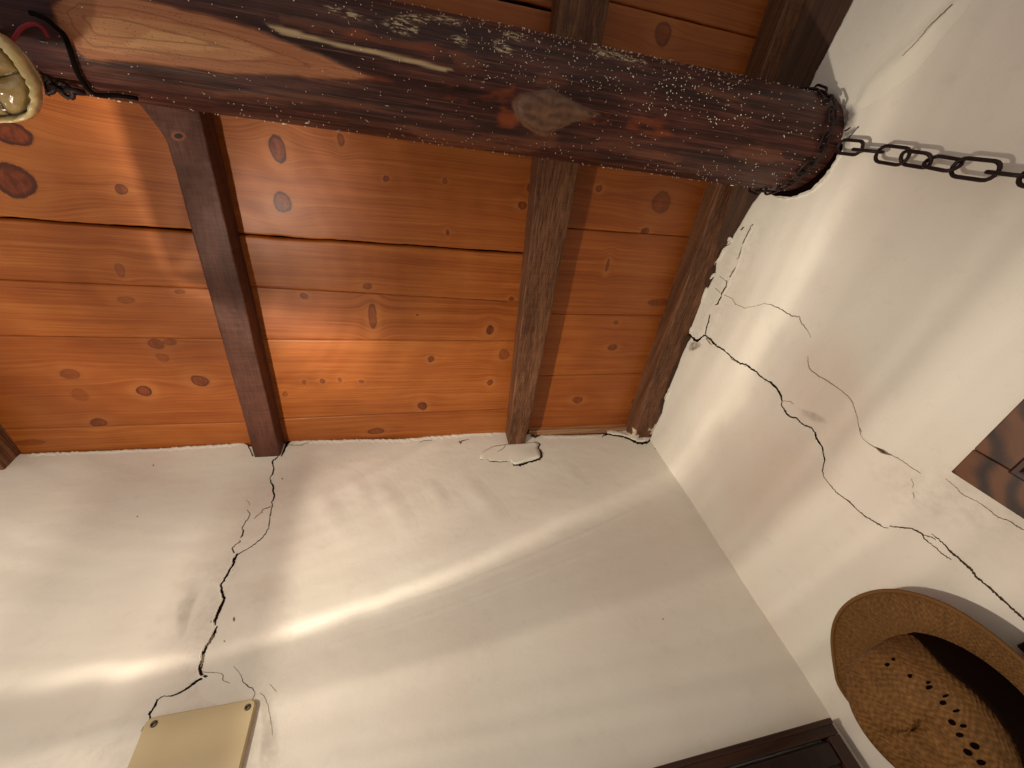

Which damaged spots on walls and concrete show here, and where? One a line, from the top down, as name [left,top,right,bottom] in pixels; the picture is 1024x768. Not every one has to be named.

peeling [701,237,733,302]
crack [141,441,309,735]
peeling [480,435,543,467]
crack [688,224,1024,620]